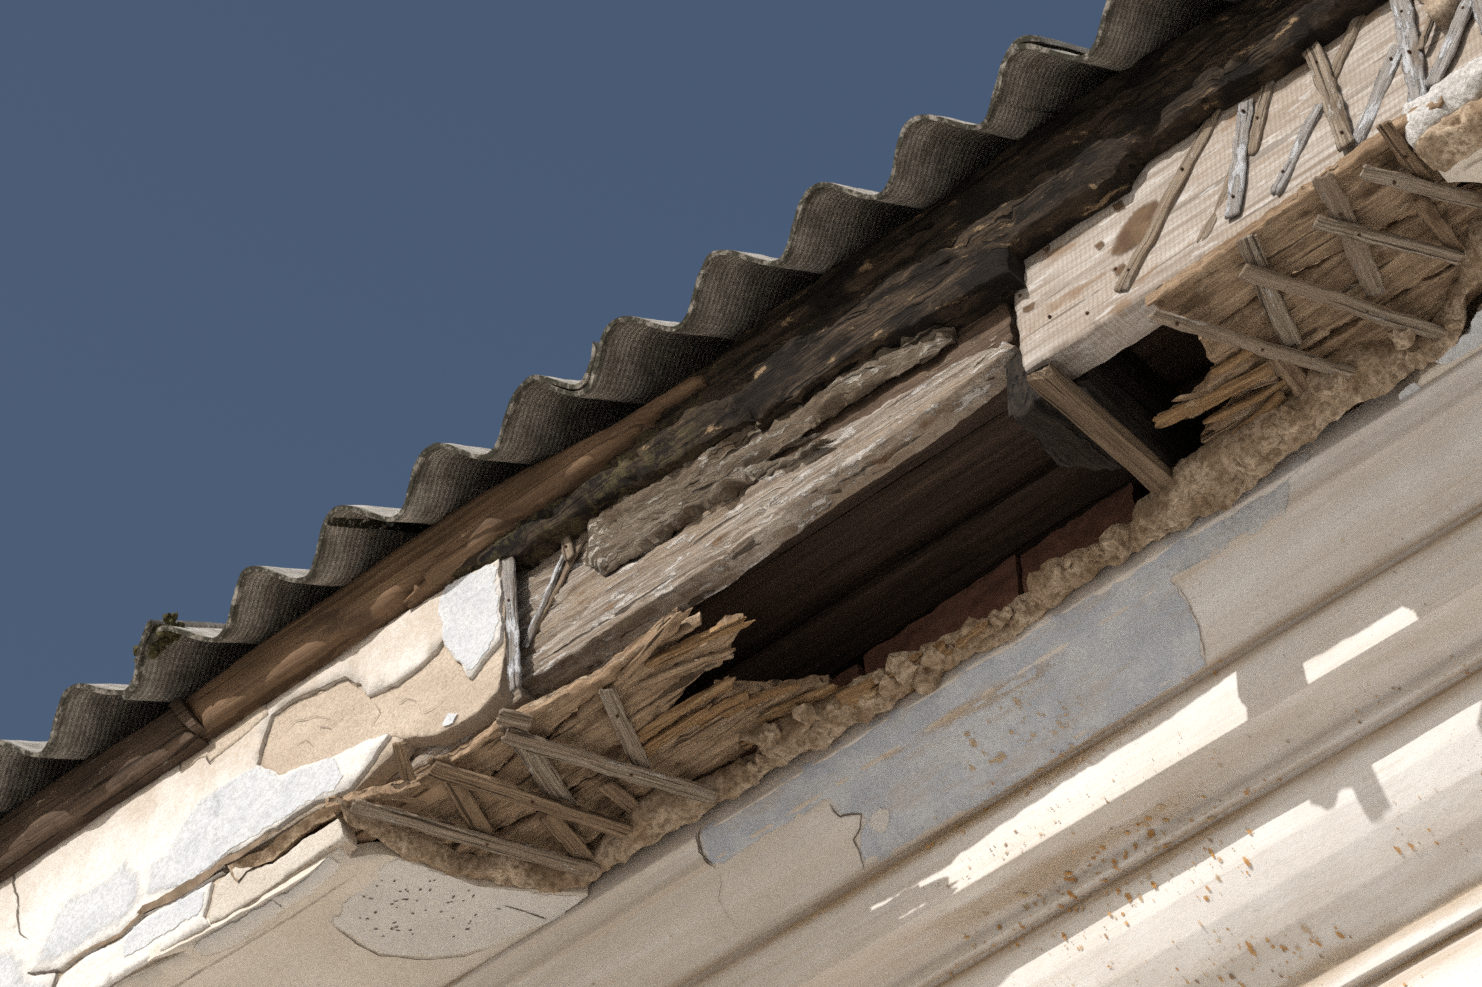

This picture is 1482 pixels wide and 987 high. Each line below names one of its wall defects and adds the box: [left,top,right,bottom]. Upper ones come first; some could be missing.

peeling [0,215,1482,987]
crack [12,831,274,987]
crack [174,883,487,987]
corrosion [926,661,1222,852]
corrosion [943,716,1300,987]
corrosion [1171,920,1324,987]